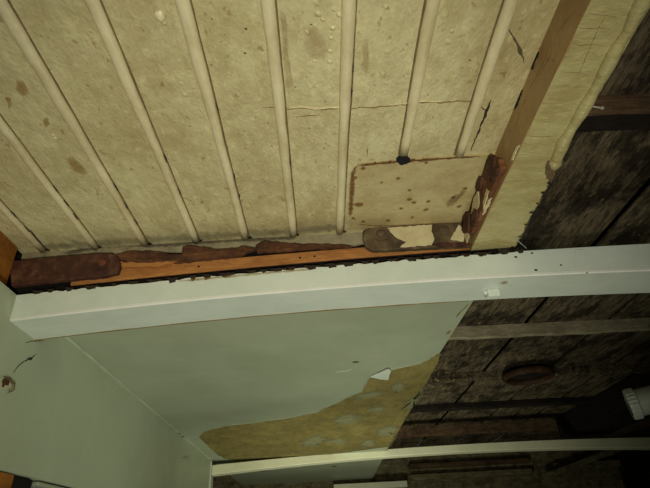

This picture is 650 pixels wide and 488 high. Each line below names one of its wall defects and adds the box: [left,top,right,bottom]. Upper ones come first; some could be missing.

crack [263,100,491,151]
rust [348,160,397,226]
peeling [199,353,440,461]